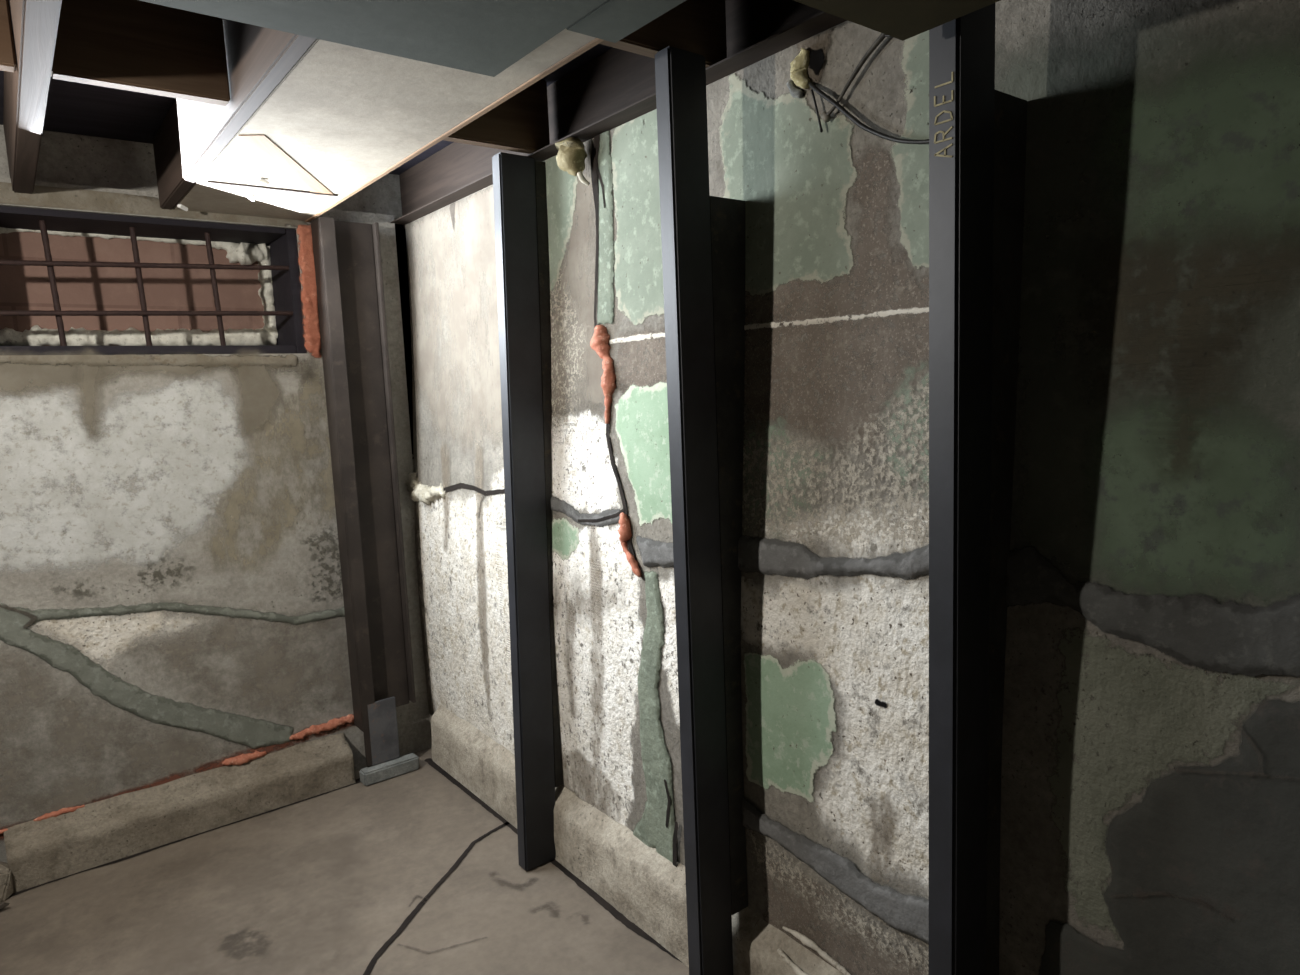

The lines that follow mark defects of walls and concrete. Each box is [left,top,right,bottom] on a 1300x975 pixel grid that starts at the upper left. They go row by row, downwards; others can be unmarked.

crack [591,134,605,327]
peeling [611,109,664,325]
peeling [719,73,857,297]
damp [0,352,335,585]
damp [305,531,342,600]
crack [578,424,645,581]
peeling [615,382,672,526]
damp [35,610,350,714]
corrosion [33,714,354,821]
peeling [743,652,836,803]
crack [363,758,518,975]
crack [550,859,688,967]